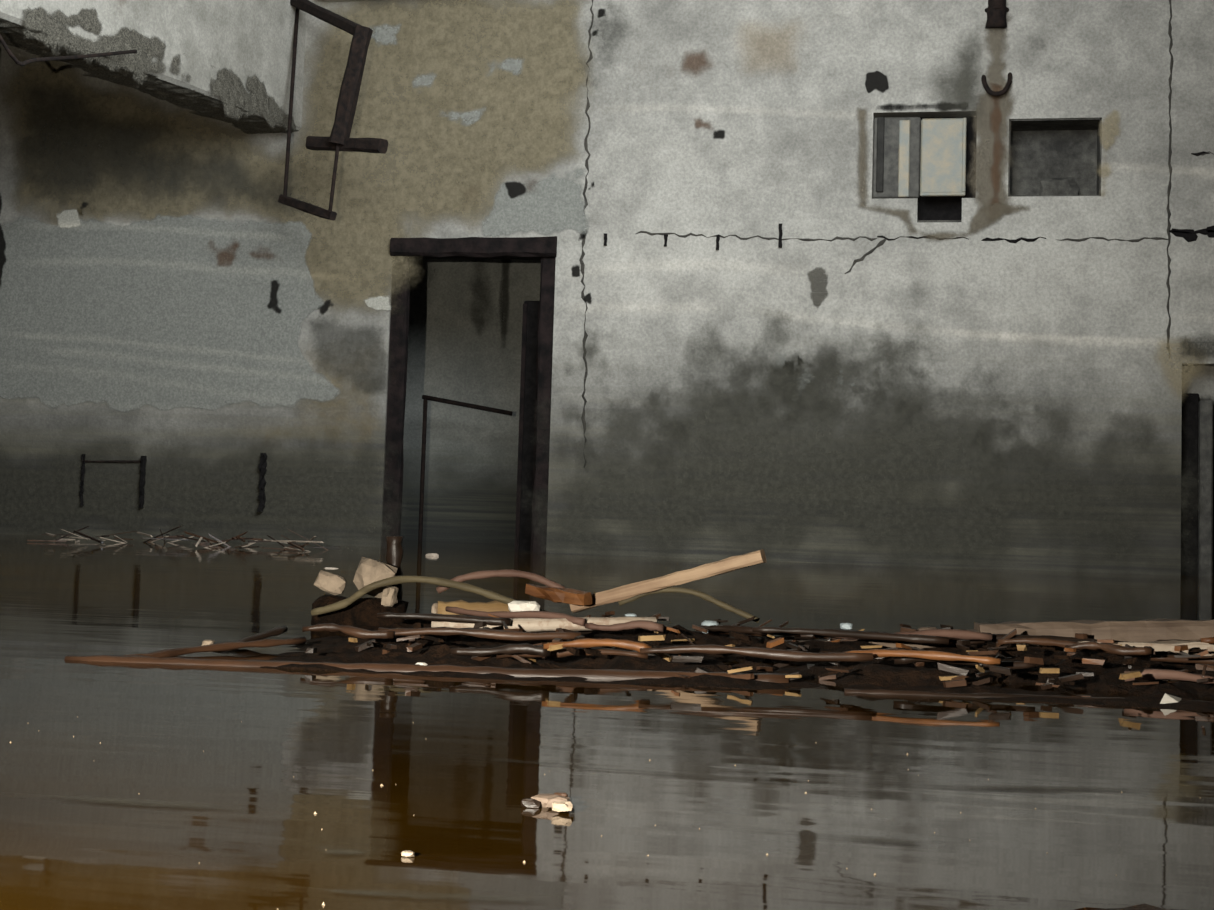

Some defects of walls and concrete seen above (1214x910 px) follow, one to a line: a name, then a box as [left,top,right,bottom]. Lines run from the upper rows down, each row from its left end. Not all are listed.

peeling [0,0,588,412]
crack [636,0,1214,359]
water stain [558,349,1137,564]